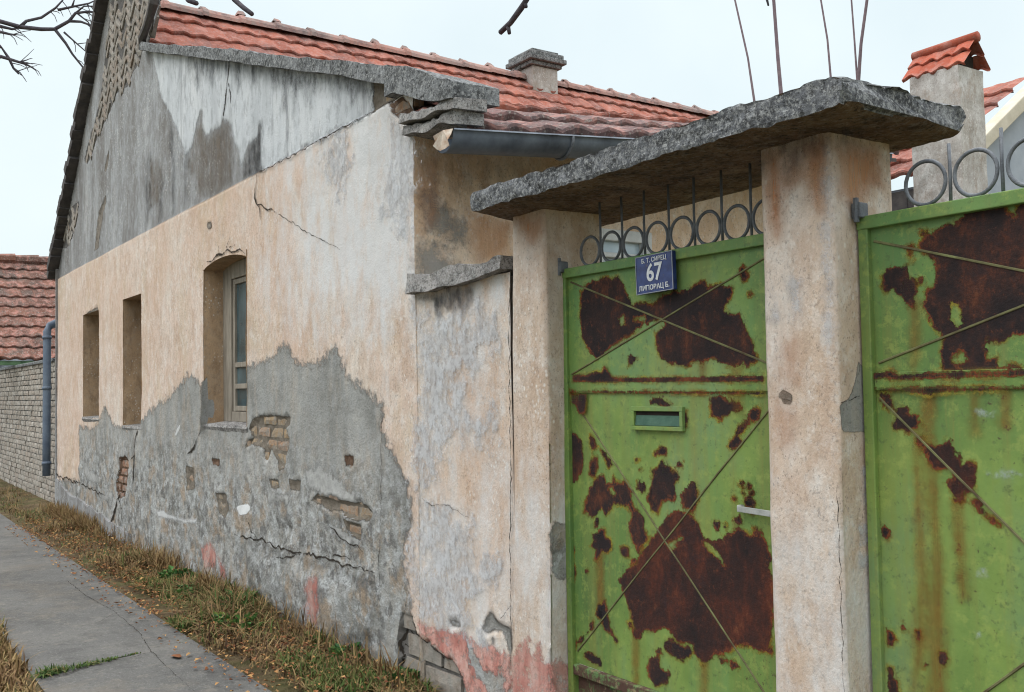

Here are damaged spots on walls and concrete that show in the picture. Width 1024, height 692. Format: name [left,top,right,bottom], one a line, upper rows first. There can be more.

spalling [63,202,79,248]
damp [248,132,261,174]
peeling [85,0,467,274]
crack [254,112,371,248]
rust [569,264,764,451]
spalling [840,363,864,432]
rust [873,204,1024,528]
peeling [58,296,512,692]
crack [234,523,380,602]
rust [572,433,774,687]